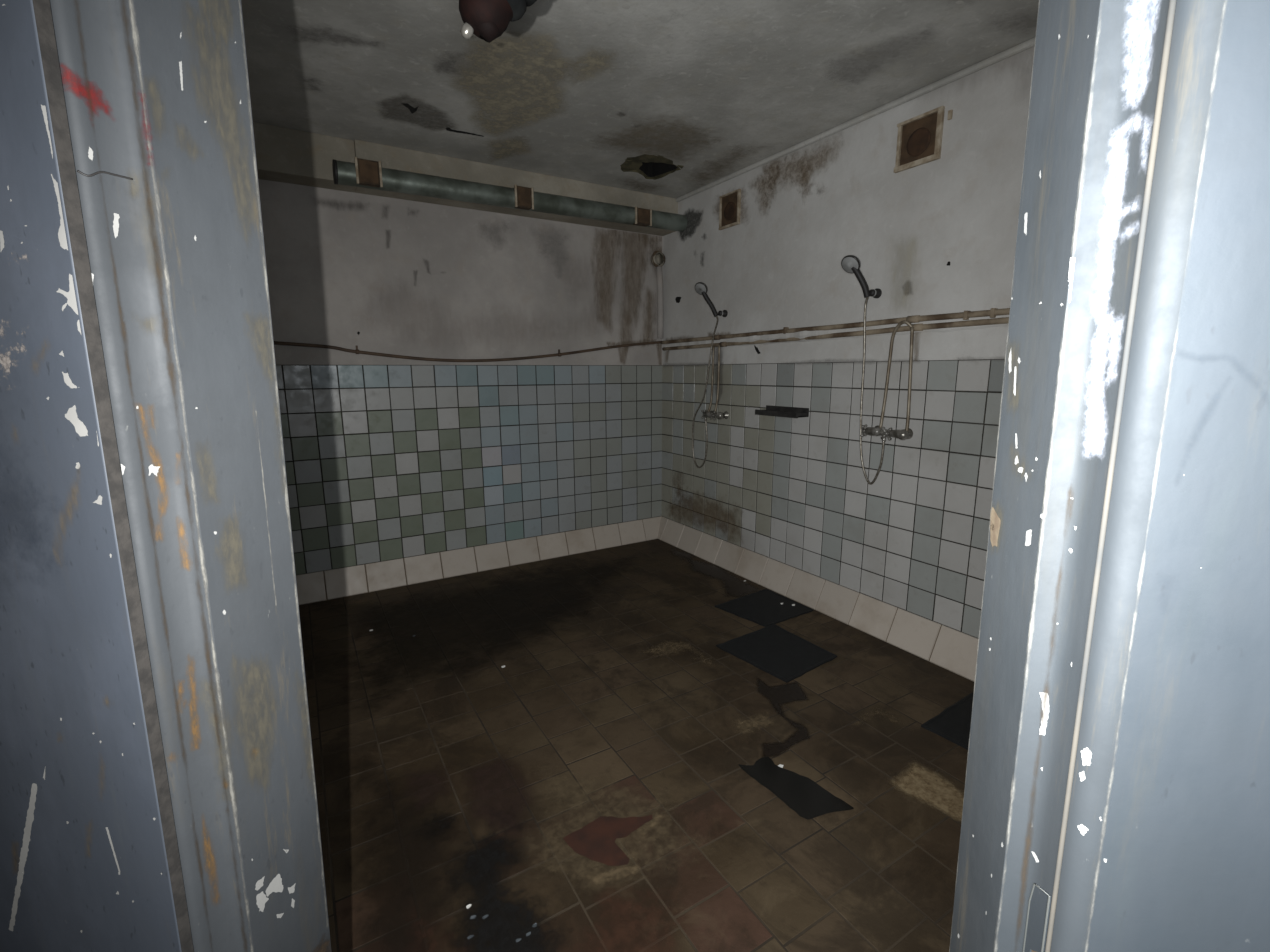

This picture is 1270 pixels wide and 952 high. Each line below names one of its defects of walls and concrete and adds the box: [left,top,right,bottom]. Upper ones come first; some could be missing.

leakage [459,38,609,158]
peeling [41,105,53,158]
peeling [51,174,68,250]
peeling [57,274,81,334]
peeling [62,372,80,388]
peeling [65,405,99,446]
peeling [1039,692,1049,735]
peeling [1079,748,1092,782]
peeling [255,874,296,918]